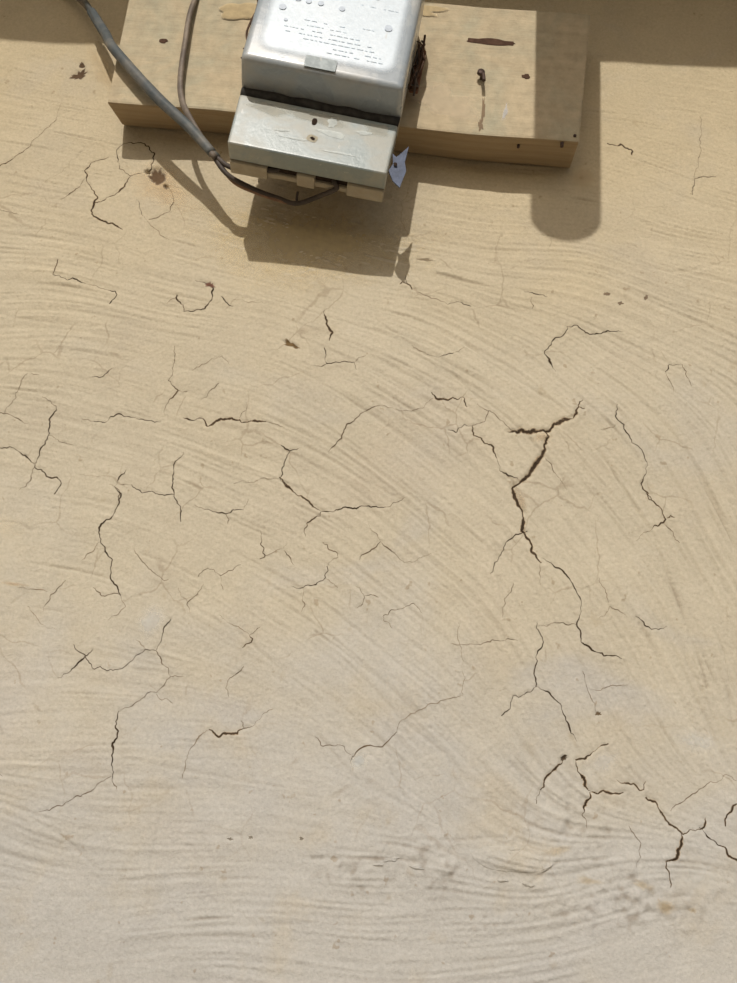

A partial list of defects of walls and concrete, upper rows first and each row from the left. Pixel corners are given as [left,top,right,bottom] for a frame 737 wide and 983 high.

crack [62,142,174,237]
crack [53,260,117,304]
crack [168,281,263,312]
crack [315,312,364,370]
crack [544,325,621,370]
crack [0,374,71,494]
crack [606,408,680,543]
crack [40,346,431,812]
crack [318,392,622,760]
crack [599,578,665,630]
crack [536,743,737,888]